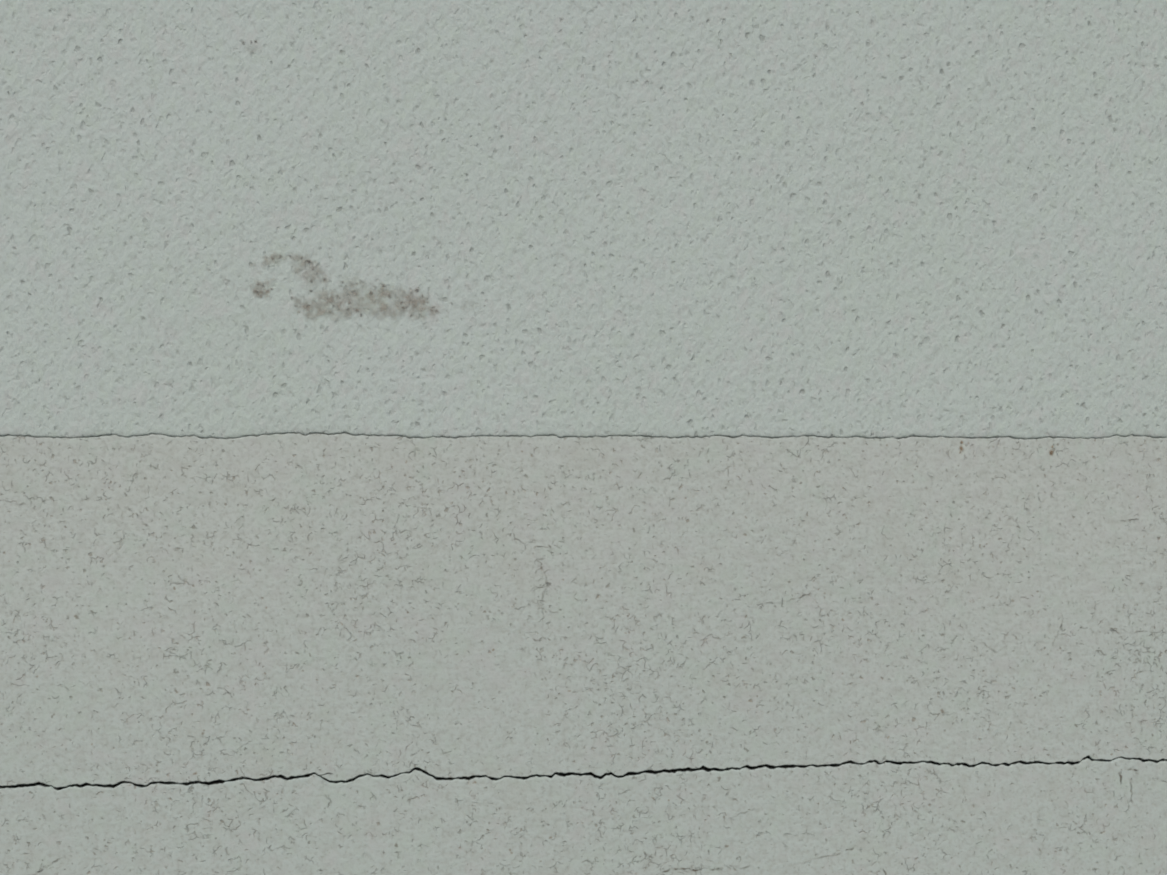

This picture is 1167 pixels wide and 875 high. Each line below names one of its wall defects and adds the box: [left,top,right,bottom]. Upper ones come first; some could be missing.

crack [0,756,1167,790]